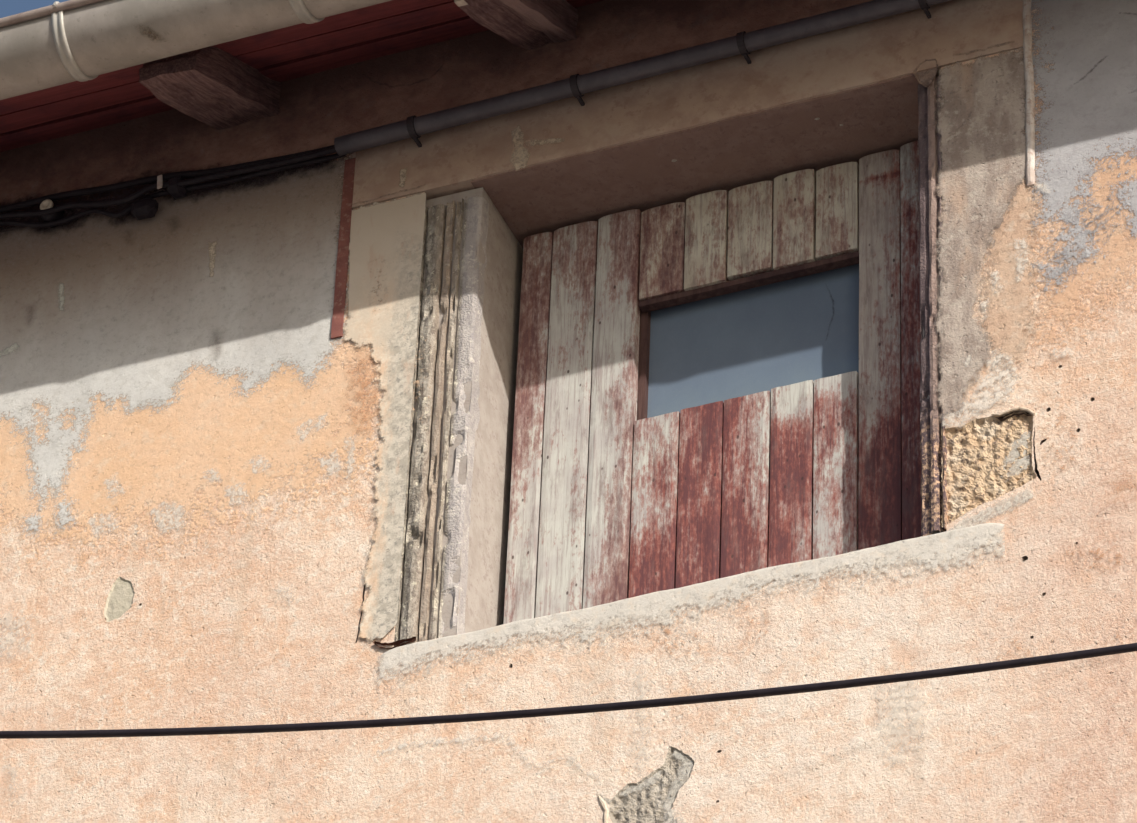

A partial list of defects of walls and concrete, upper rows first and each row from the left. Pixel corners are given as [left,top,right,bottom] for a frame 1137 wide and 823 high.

peeling [0,156,387,582]
peeling [941,0,1137,530]
spalling [104,570,142,622]
spalling [597,746,694,823]